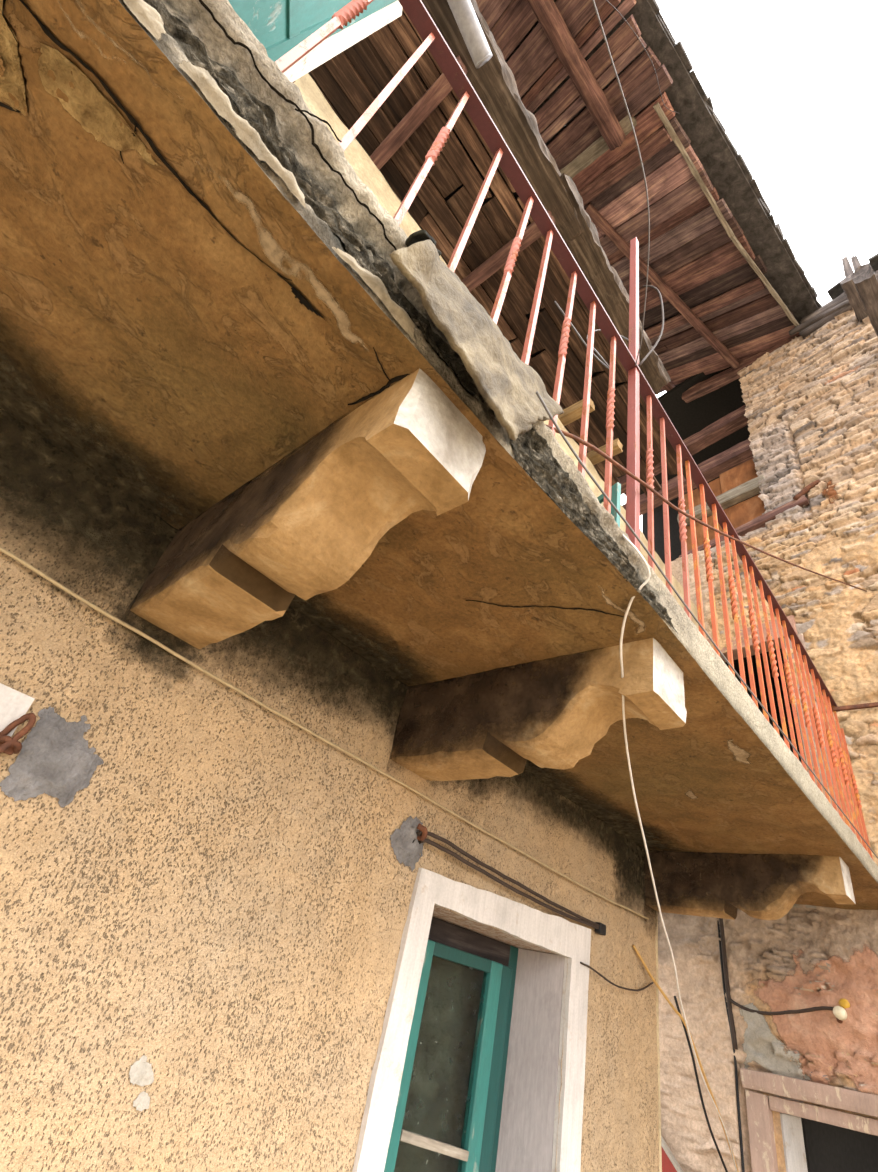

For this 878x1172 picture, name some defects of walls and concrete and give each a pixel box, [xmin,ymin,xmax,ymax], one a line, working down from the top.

spalling [0,0,28,116]
spalling [38,42,158,166]
crack [0,0,292,281]
damp [225,180,367,349]
crack [199,0,397,250]
spalling [123,0,495,425]
damp [0,327,341,678]
damp [212,595,594,763]
damp [598,586,645,633]
damp [456,760,819,925]
peeling [754,944,878,1095]